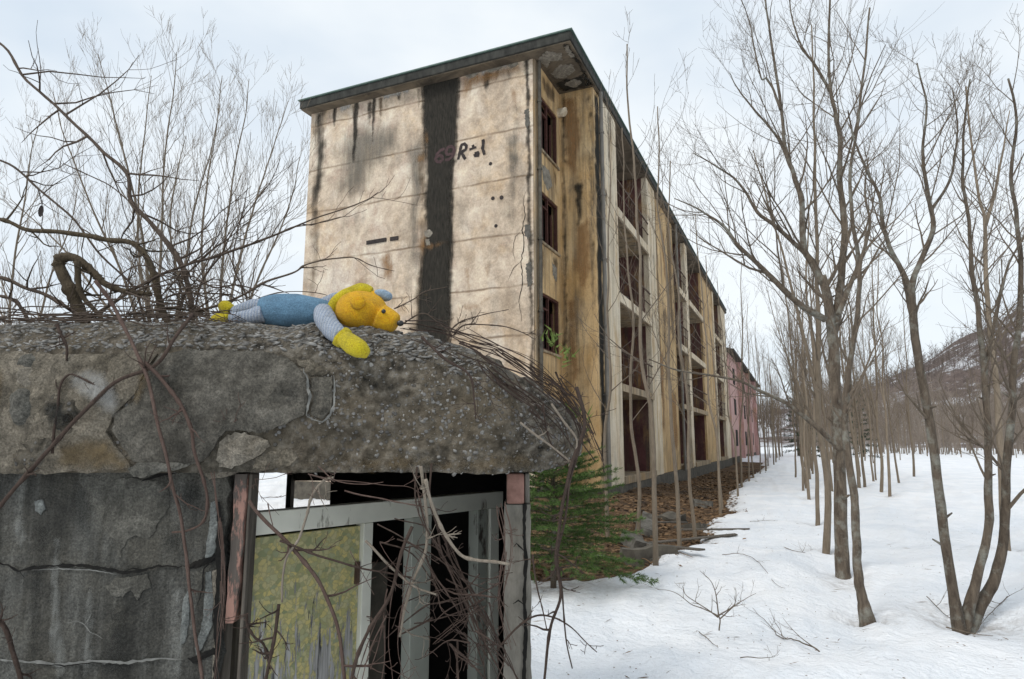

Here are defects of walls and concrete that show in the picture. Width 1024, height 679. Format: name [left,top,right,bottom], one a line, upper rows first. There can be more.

damp [313,108,337,215]
damp [348,98,385,187]
damp [413,77,460,343]
corrosion [565,99,579,168]
peeling [0,348,333,558]
crack [0,501,222,679]
peeling [180,569,219,679]